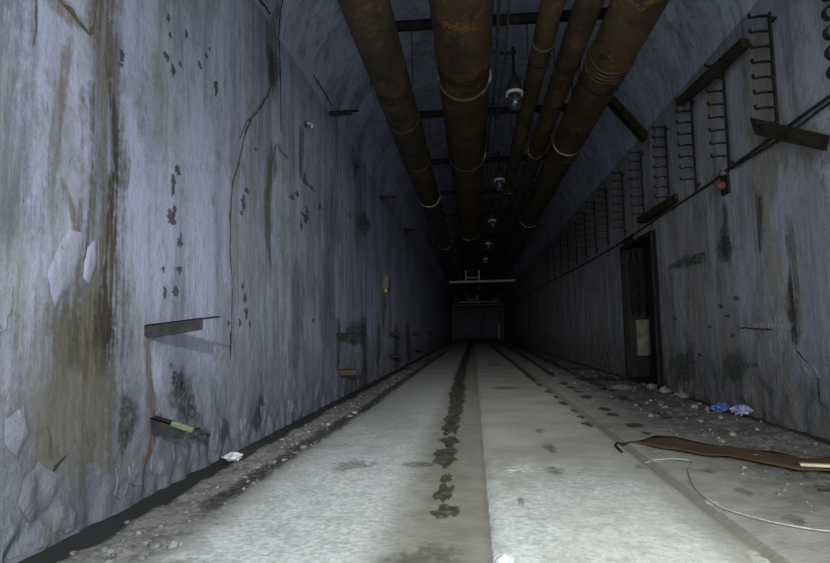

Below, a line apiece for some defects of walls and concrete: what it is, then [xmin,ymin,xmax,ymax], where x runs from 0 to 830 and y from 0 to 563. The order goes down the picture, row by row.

crack [32,0,98,47]
water stain [49,0,129,464]
crack [229,0,283,359]
crack [267,143,288,256]
water stain [786,186,830,365]